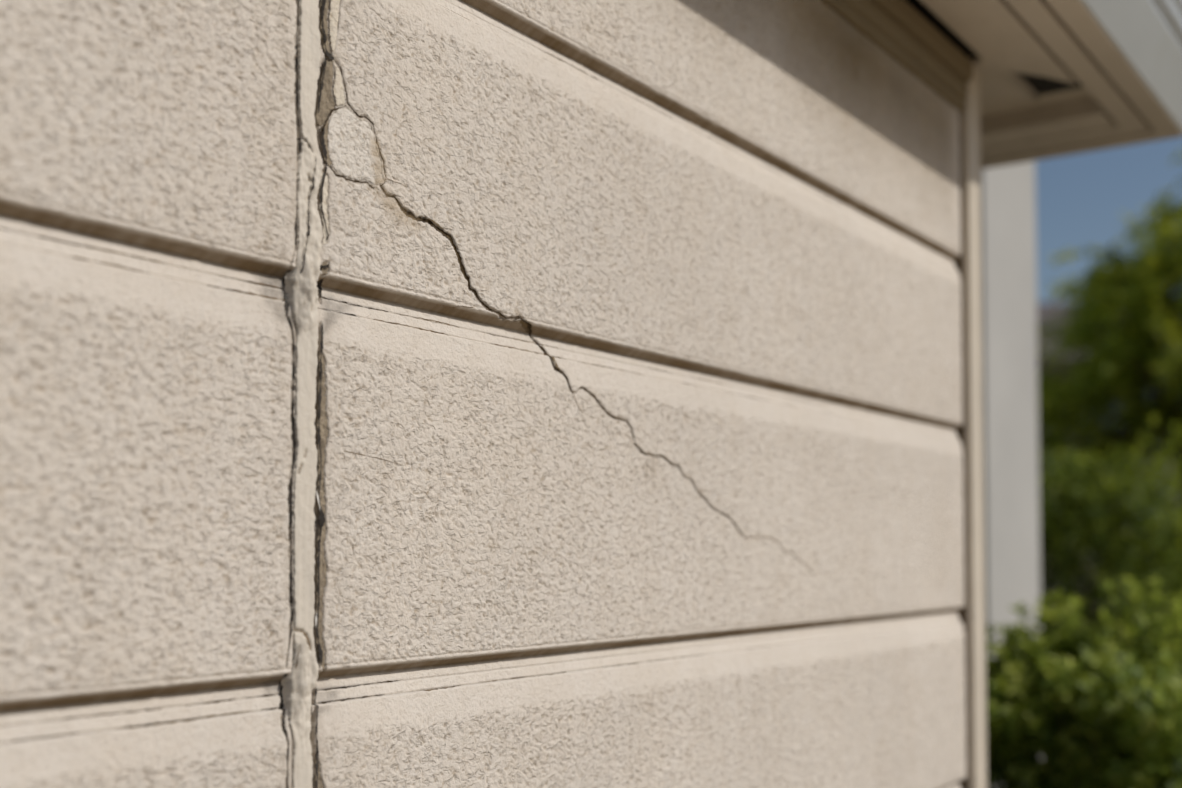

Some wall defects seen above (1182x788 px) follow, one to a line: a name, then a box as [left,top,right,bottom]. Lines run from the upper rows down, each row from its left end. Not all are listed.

crack [0,228,166,273]
crack [206,60,830,577]